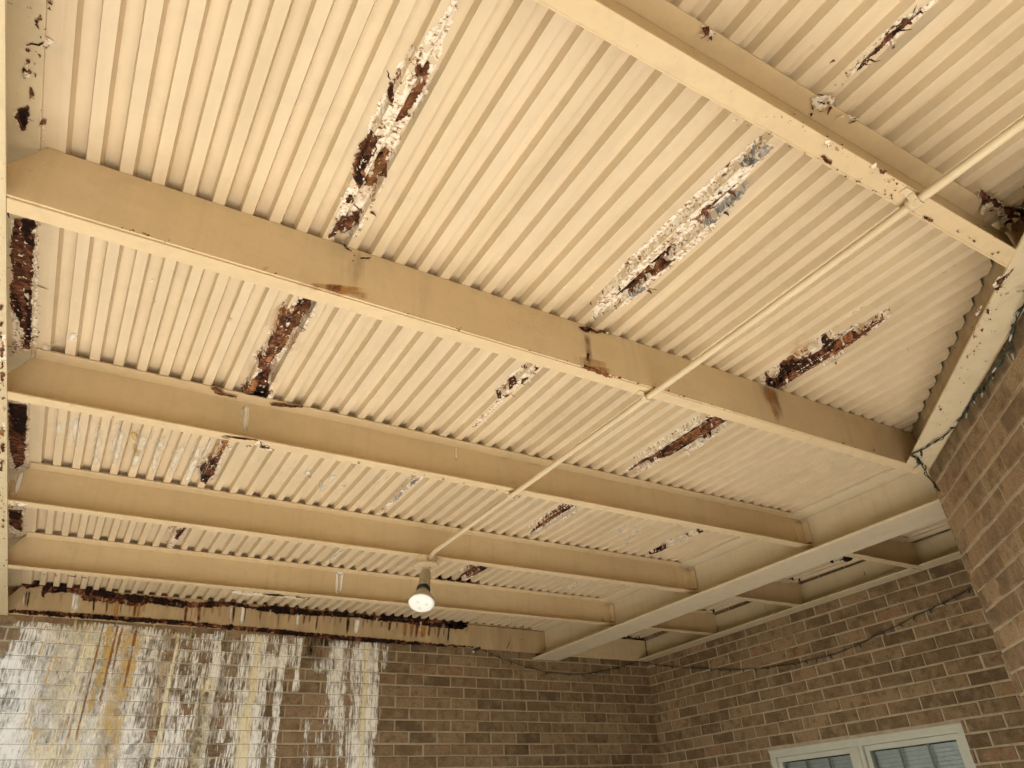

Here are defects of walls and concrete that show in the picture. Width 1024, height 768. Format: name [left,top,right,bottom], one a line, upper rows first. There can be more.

rust [818,0,935,96]
rust [327,0,459,242]
rust [977,189,1024,232]
rust [0,213,49,478]
rust [210,297,316,408]
rust [760,307,892,414]
rust [197,436,272,486]
rust [624,404,735,474]
rust [527,503,580,537]
rust [8,574,474,648]
water stain [0,594,388,768]